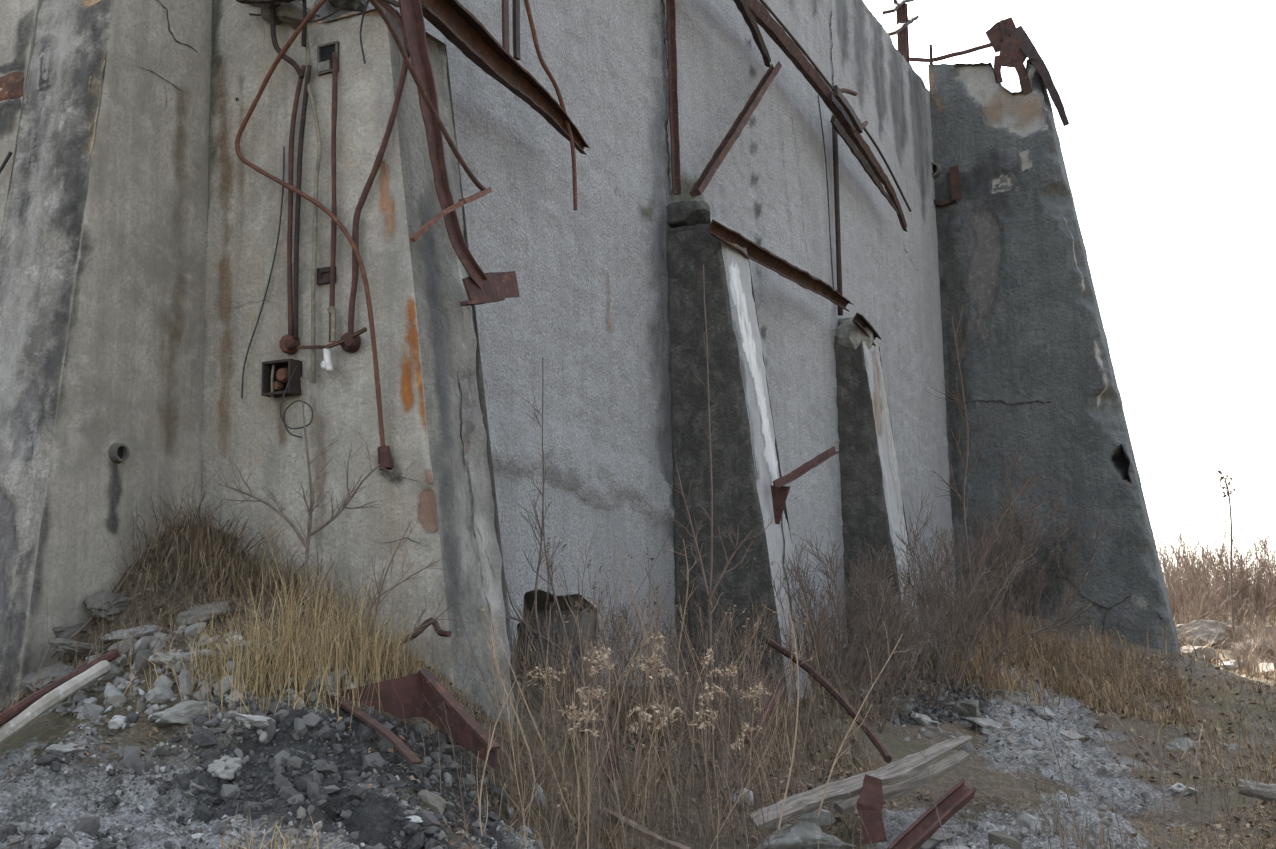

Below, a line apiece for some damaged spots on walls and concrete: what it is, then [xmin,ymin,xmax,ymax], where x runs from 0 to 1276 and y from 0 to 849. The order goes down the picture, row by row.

crack [158,0,195,50]
spalling [955,63,1048,193]
rust [380,161,395,237]
spalling [965,209,1004,344]
rust [401,300,427,431]
leakage [108,462,121,533]
spalling [1112,453,1130,482]